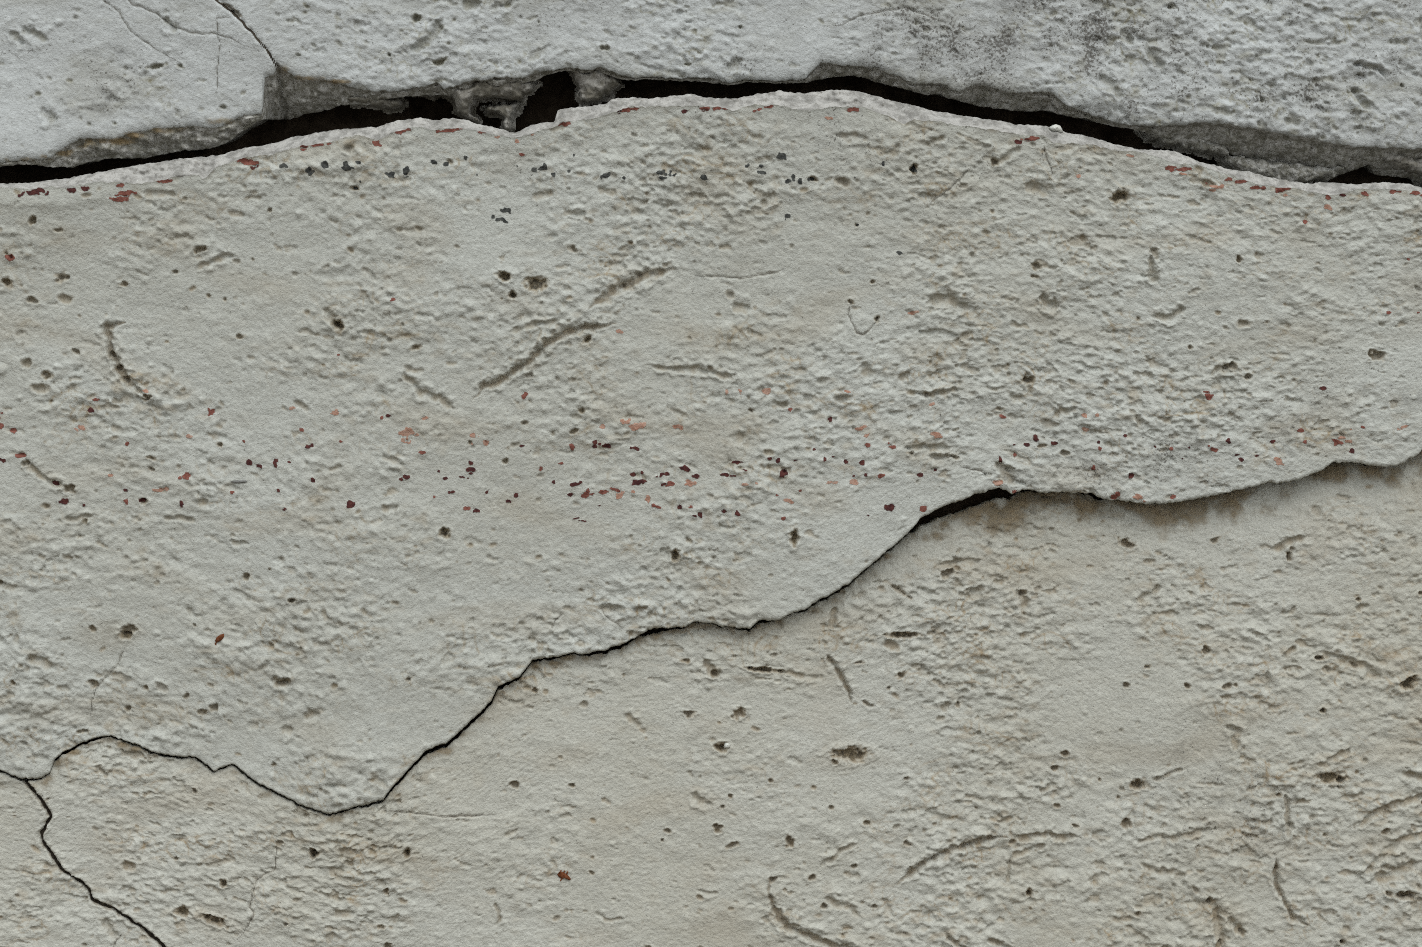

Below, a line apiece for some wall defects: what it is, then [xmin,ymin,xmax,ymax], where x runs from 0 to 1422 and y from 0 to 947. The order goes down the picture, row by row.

crack [215,0,277,66]
crack [0,70,1422,188]
crack [1079,492,1131,502]
crack [332,488,1037,814]
crack [24,736,166,947]